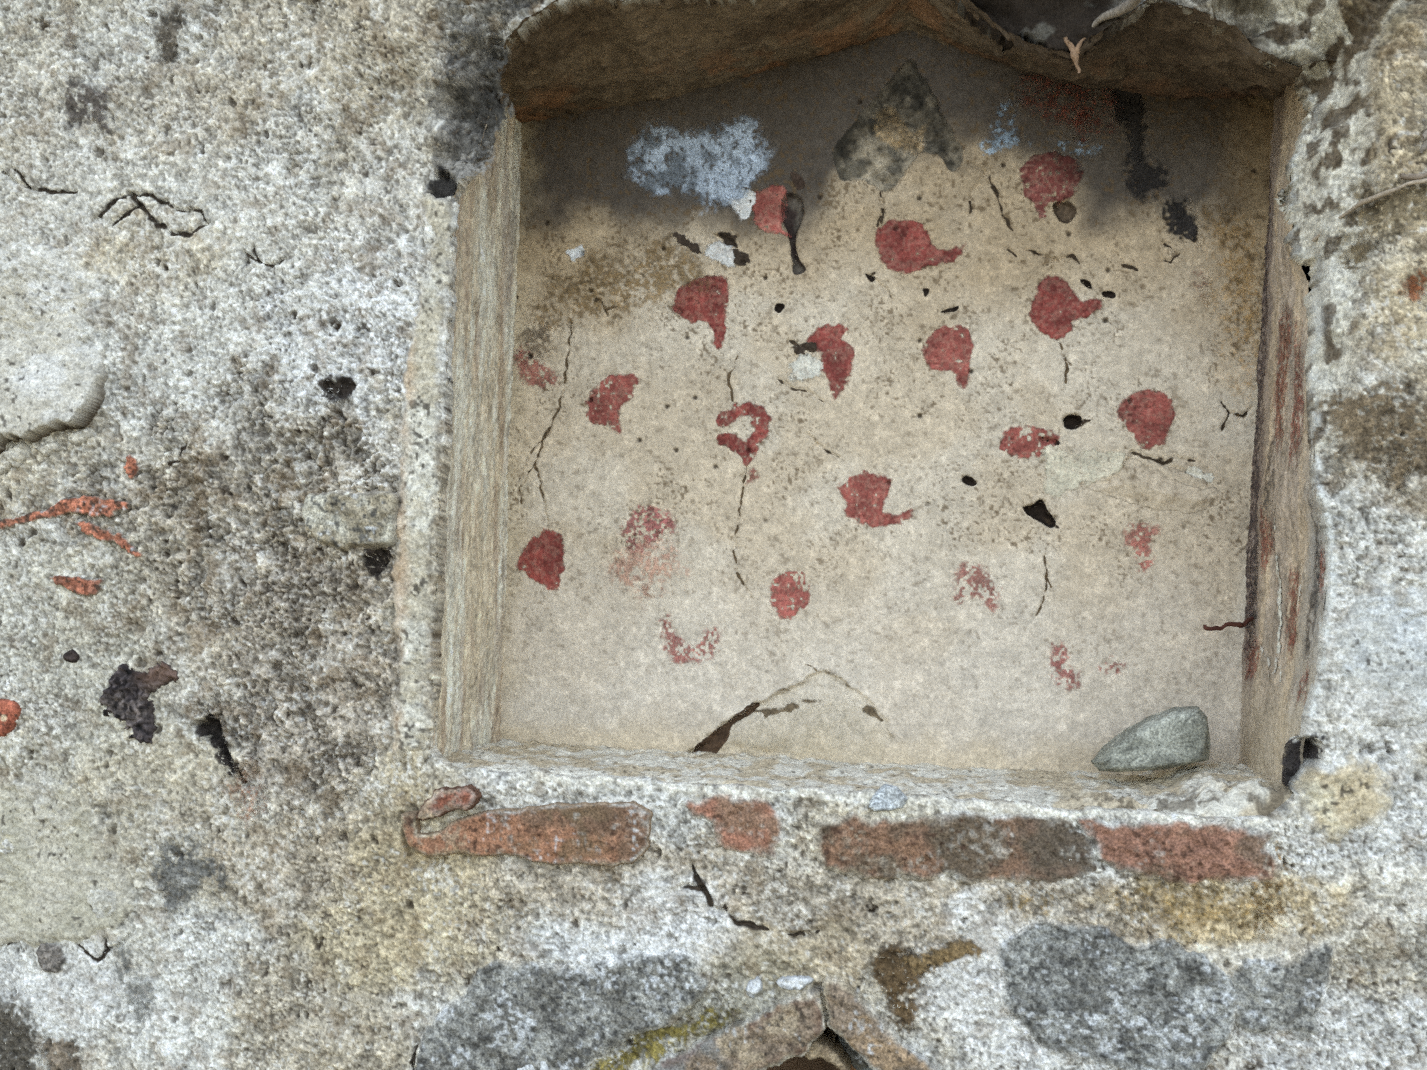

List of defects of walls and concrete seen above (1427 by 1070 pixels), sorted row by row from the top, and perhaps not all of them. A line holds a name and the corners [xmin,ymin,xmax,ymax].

spalling [832,60,963,191]
crack [2,169,209,238]
spalling [566,245,584,261]
spalling [673,232,750,267]
spalling [729,188,756,219]
spalling [781,172,806,275]
spalling [1053,201,1077,223]
crack [683,864,820,937]